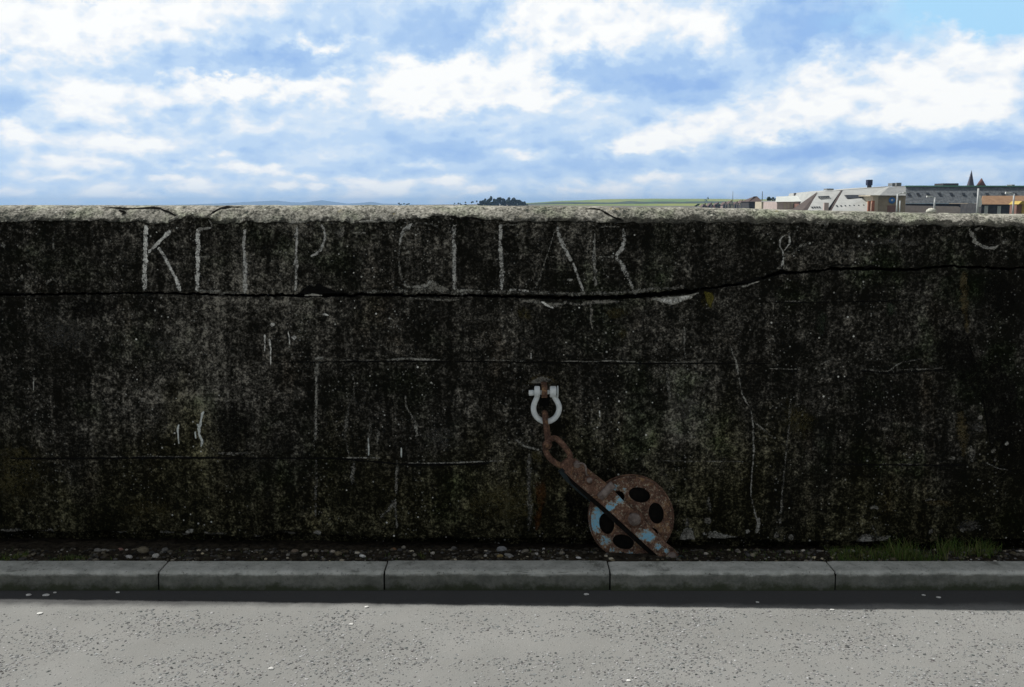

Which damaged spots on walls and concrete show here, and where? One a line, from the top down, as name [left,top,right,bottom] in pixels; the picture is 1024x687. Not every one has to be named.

crack [0,257,1024,316]